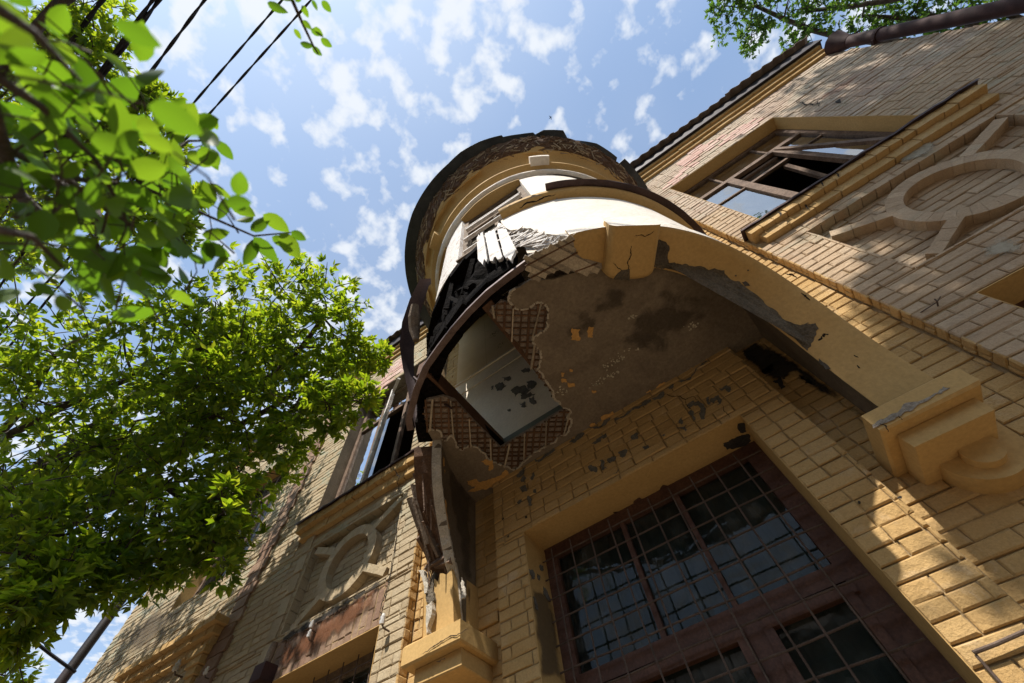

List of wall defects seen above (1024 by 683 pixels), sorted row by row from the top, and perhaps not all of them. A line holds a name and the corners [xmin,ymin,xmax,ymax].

flaking render [654,239,819,350]
flaking render [419,288,708,635]
peeling [723,423,751,450]
flaking render [872,387,949,428]